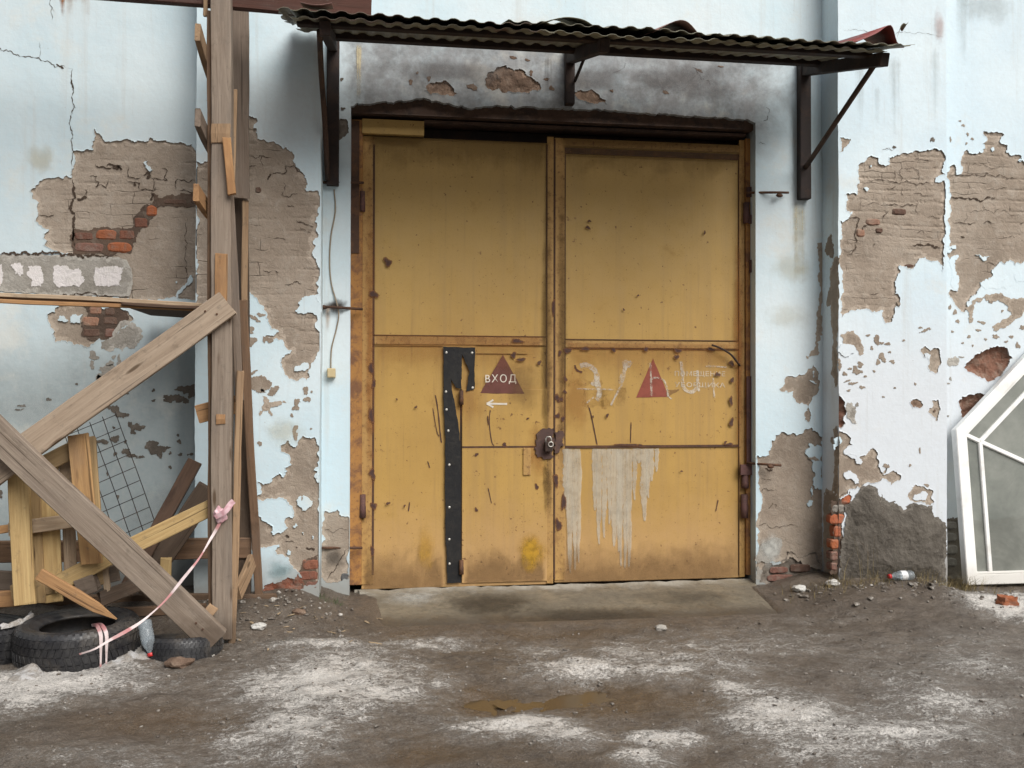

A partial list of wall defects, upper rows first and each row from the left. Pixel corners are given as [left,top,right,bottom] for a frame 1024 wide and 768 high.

crack [0,43,76,164]
peeling [409,56,555,98]
peeling [575,88,613,105]
peeling [29,127,208,380]
peeling [248,115,350,591]
peeling [753,120,1024,584]